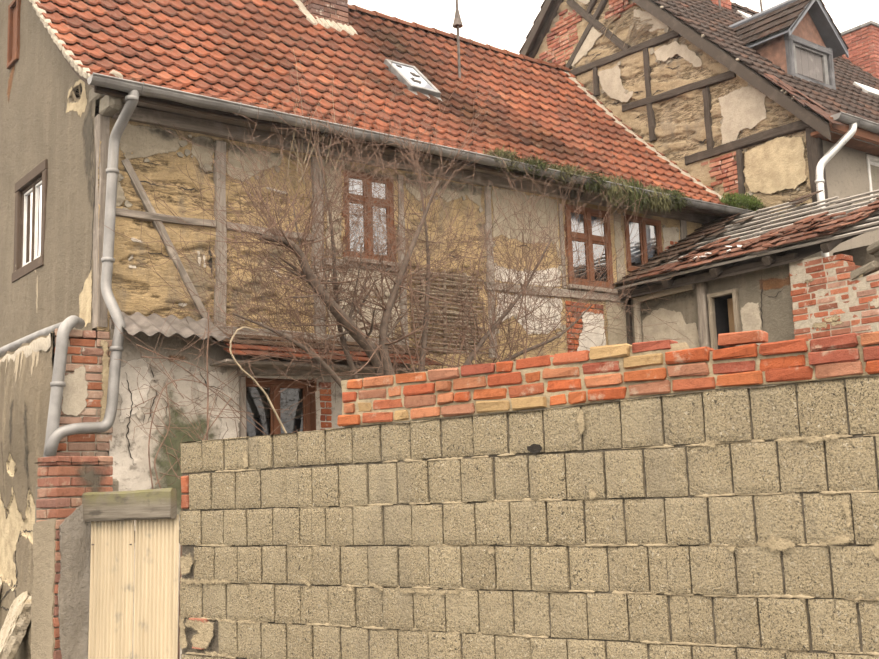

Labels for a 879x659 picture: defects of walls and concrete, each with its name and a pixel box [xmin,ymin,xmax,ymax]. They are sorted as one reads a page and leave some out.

flaking render [539,0,603,68]
peeling [604,0,702,67]
spalling [66,79,87,118]
peeling [598,61,633,102]
peeling [701,83,807,197]
peeling [642,308,700,349]
peeling [62,366,89,416]
crack [125,367,168,465]
peeling [0,453,35,591]